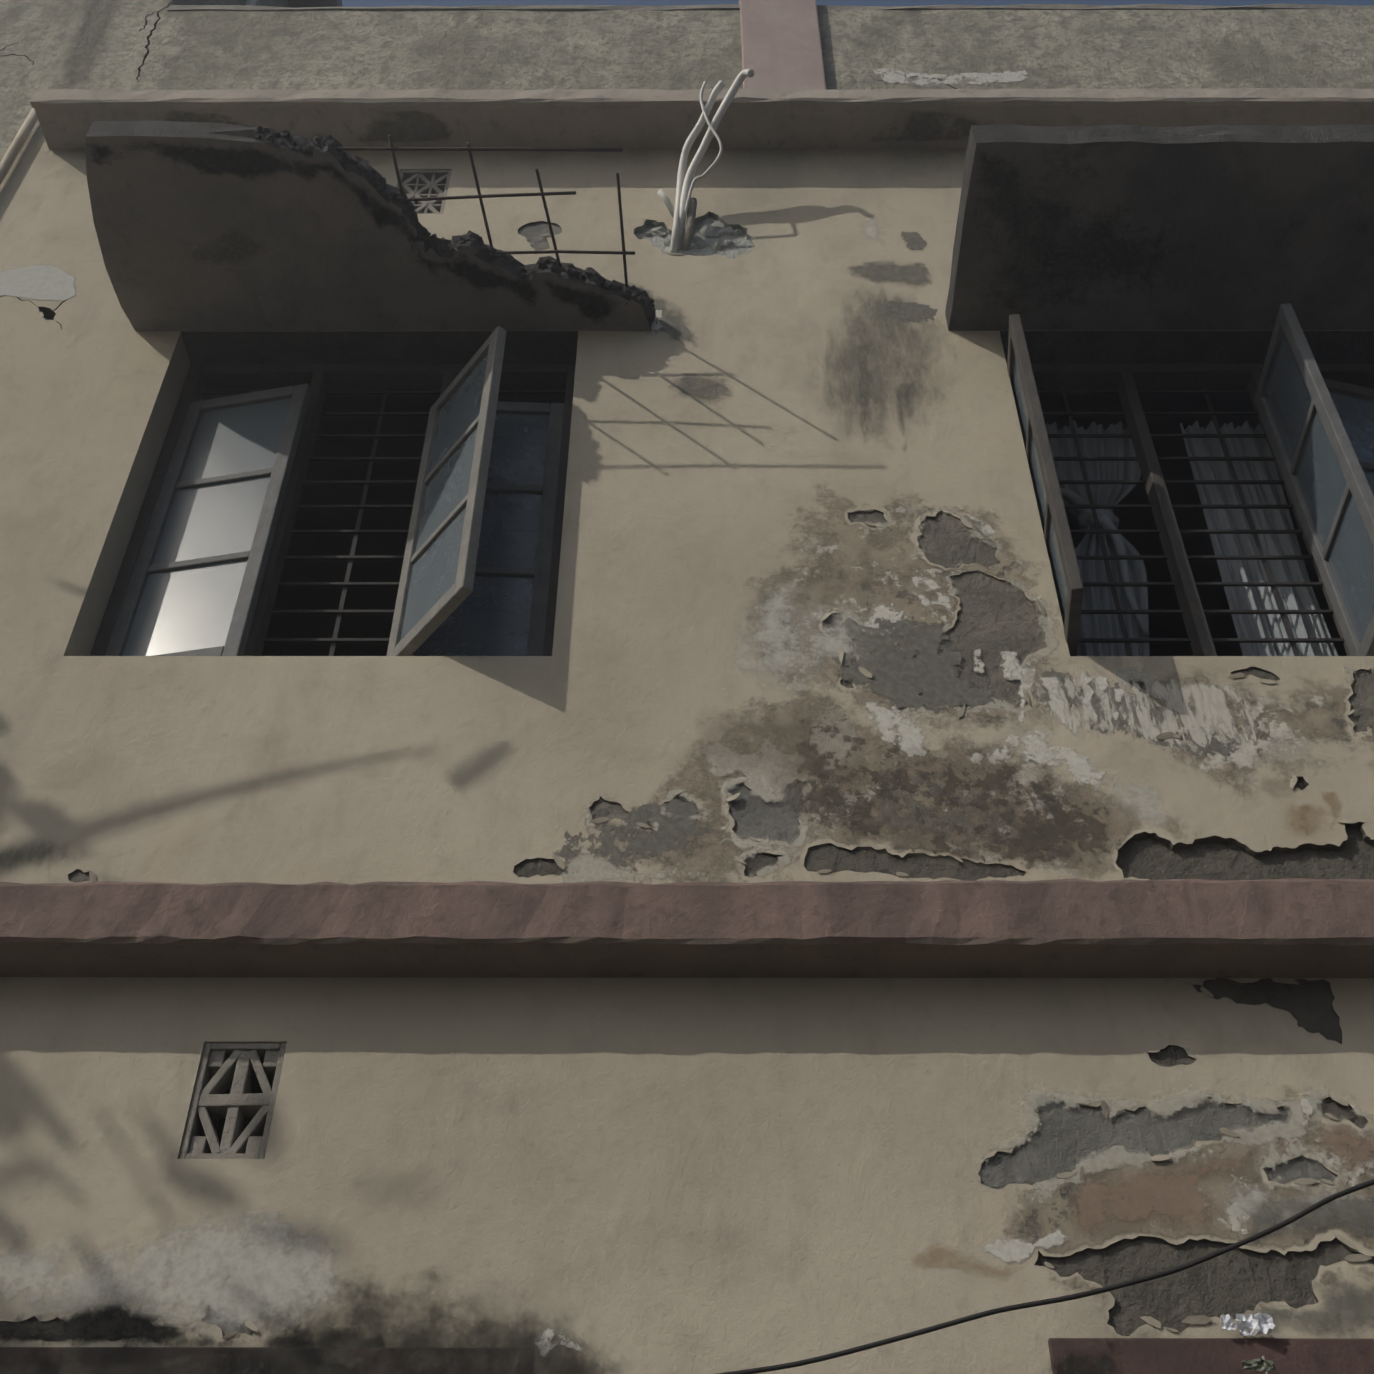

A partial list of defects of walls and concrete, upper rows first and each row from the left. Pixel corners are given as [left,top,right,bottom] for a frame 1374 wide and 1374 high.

crack [136,2,171,81]
spalling [254,126,755,312]
spalling [38,307,56,320]
damp [831,231,938,425]
peeling [513,494,1374,883]
peeling [1147,1045,1196,1067]
peeling [1183,977,1342,1044]
peeling [978,1087,1374,1336]
damp [0,1212,596,1374]